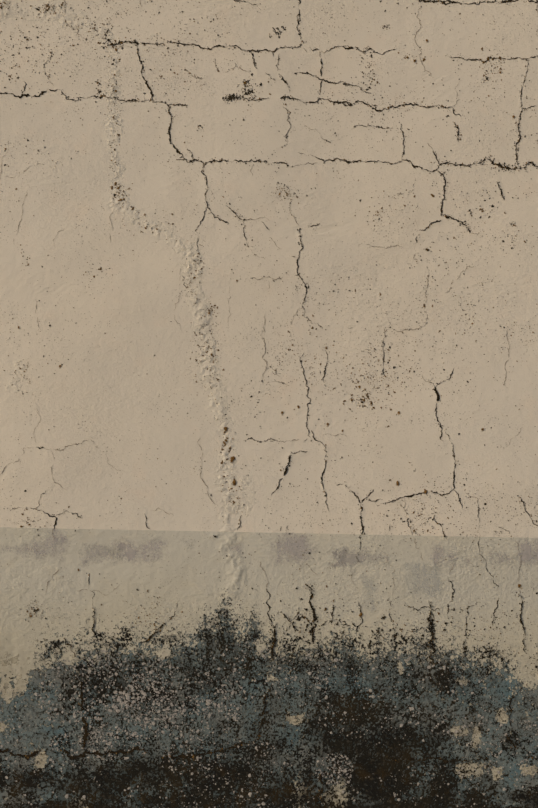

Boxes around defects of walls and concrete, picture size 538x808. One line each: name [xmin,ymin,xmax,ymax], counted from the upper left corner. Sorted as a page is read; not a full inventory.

crack [381,271,429,376]
crack [1,410,92,541]
crack [247,316,499,630]
crack [260,562,334,661]
crack [382,551,475,665]
crack [518,550,526,650]
damp [0,585,538,808]